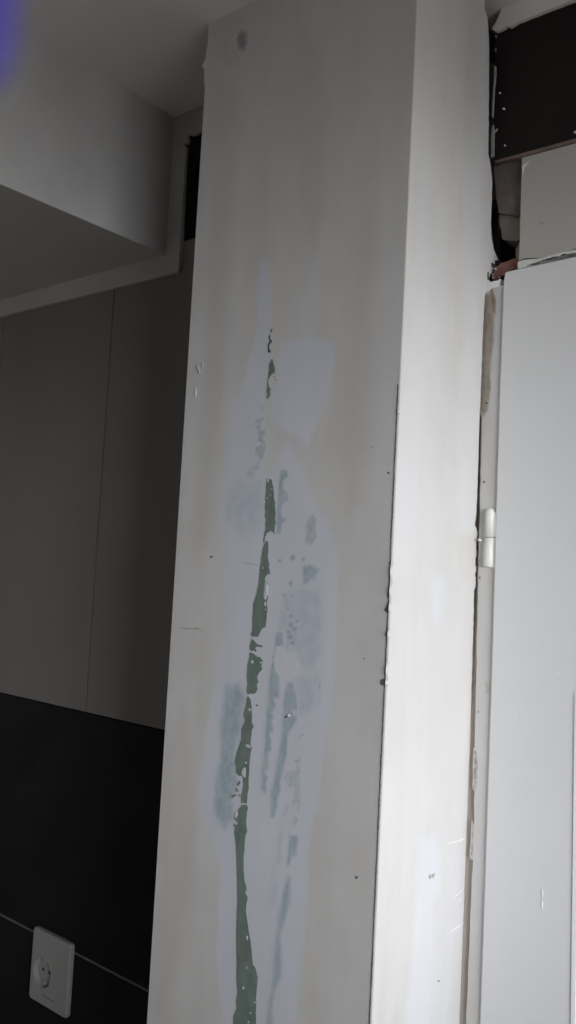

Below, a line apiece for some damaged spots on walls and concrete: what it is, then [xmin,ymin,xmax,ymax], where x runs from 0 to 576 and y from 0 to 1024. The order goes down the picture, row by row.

peeling [266,359,277,399]
peeling [231,479,306,1024]